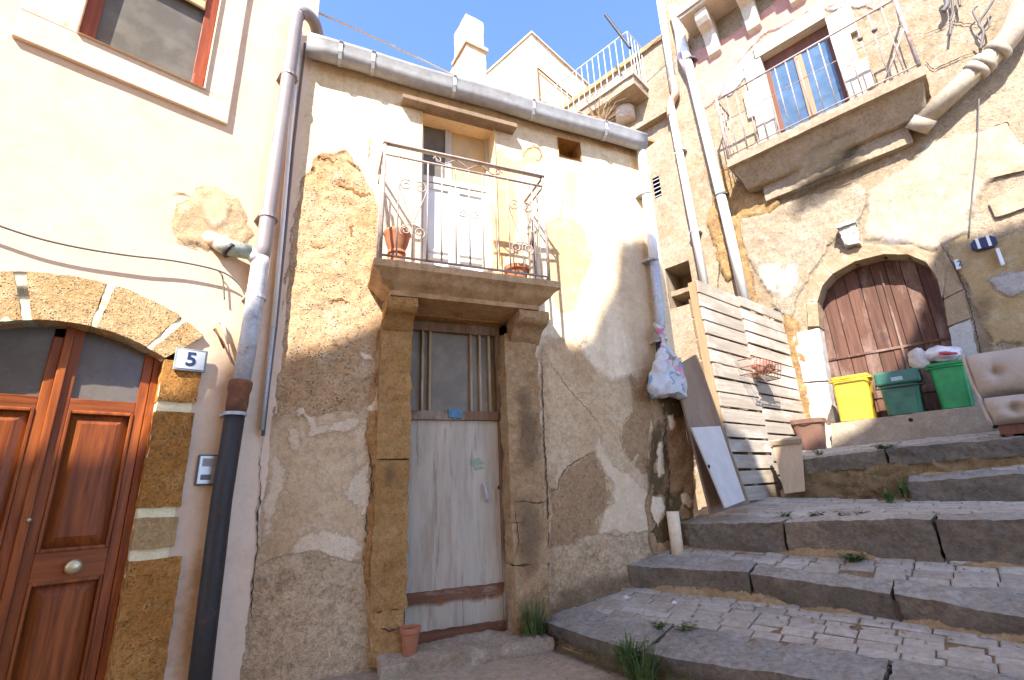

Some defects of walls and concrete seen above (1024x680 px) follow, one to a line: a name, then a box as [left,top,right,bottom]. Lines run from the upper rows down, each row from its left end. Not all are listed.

peeling [172,186,253,251]
peeling [273,137,385,468]
peeling [706,163,867,419]
spalling [363,485,375,596]
crack [514,349,598,564]
peeling [548,452,610,548]
spalling [620,374,696,555]